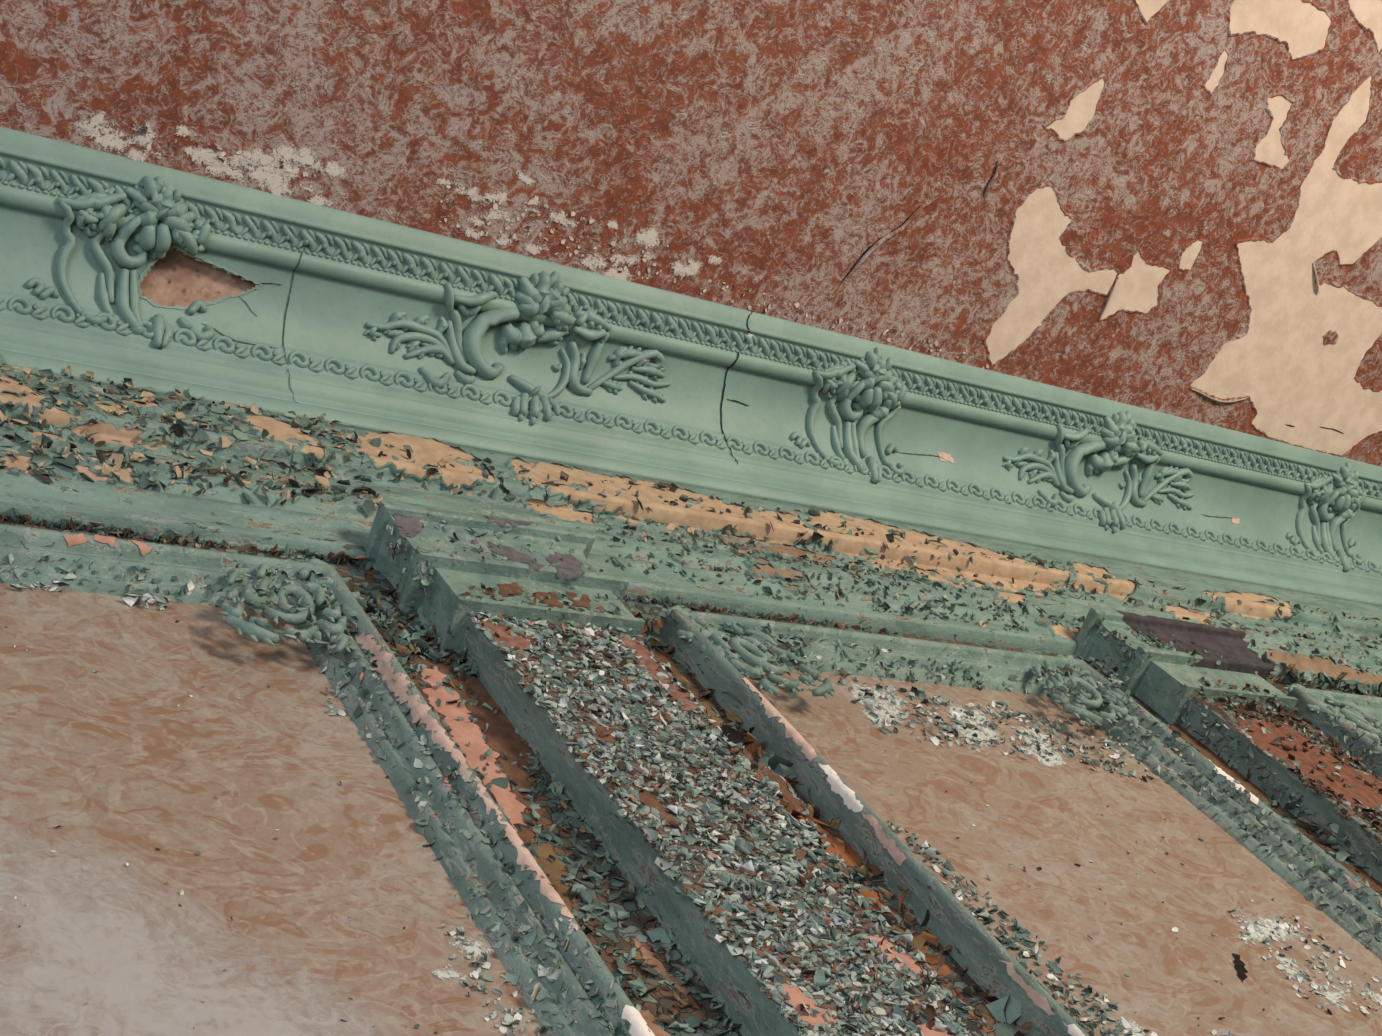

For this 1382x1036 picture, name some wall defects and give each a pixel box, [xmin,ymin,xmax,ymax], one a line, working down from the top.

peeling [1133,0,1175,25]
peeling [1202,0,1333,96]
peeling [1347,0,1382,54]
peeling [1042,74,1108,143]
spalling [138,244,264,310]
peeling [831,183,1206,369]
peeling [1189,73,1382,457]
crack [720,311,753,463]